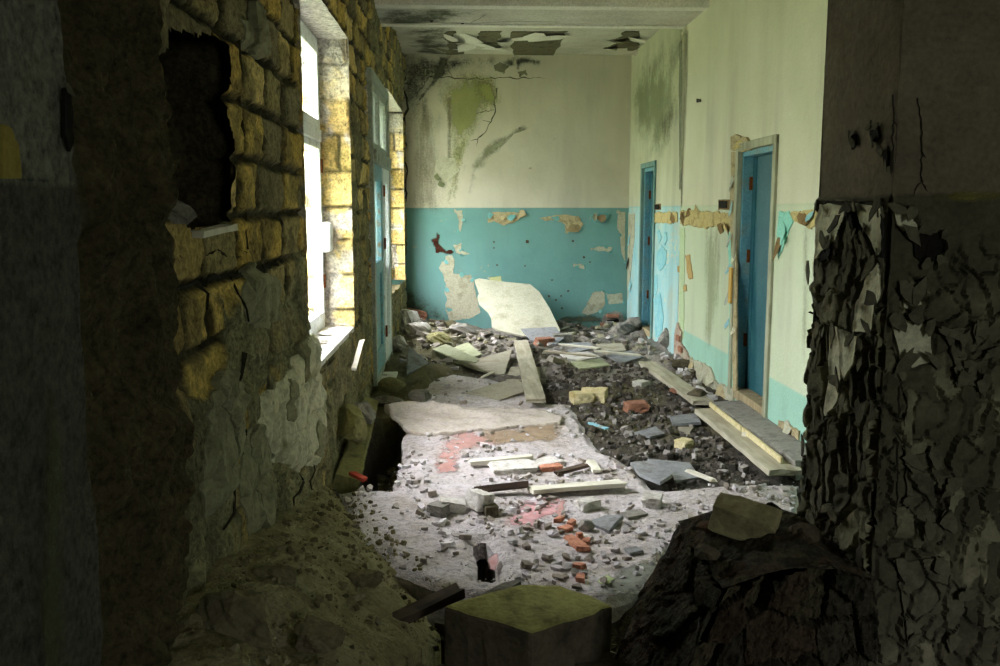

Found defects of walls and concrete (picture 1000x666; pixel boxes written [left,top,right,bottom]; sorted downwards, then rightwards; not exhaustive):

leakage [381,10,496,198]
crack [403,70,540,201]
peeling [432,23,570,77]
leakage [506,58,539,68]
peeling [603,31,647,56]
crack [890,95,928,194]
peeling [439,209,480,320]
flaking render [487,210,527,225]
peeling [541,210,635,326]
flaking render [653,134,755,401]
peeling [772,196,1000,420]
peeling [198,334,329,536]